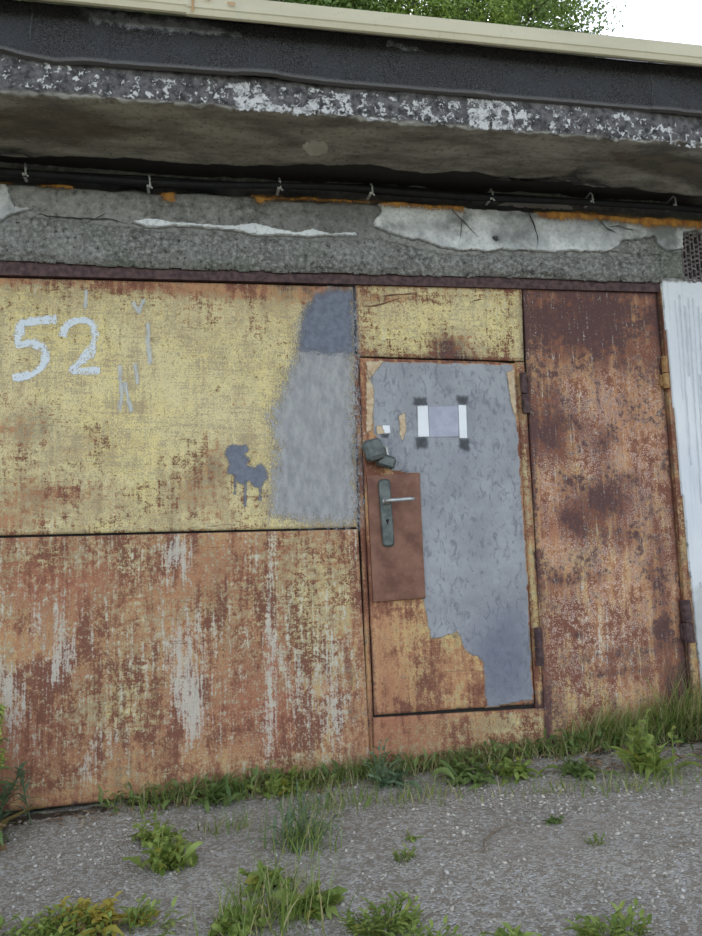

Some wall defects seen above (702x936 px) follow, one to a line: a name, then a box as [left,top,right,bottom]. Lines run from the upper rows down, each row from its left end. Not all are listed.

flaking render [0,184,32,222]
rust [252,195,465,212]
flaking render [131,218,358,239]
flaking render [373,192,702,256]
rust [535,211,702,229]